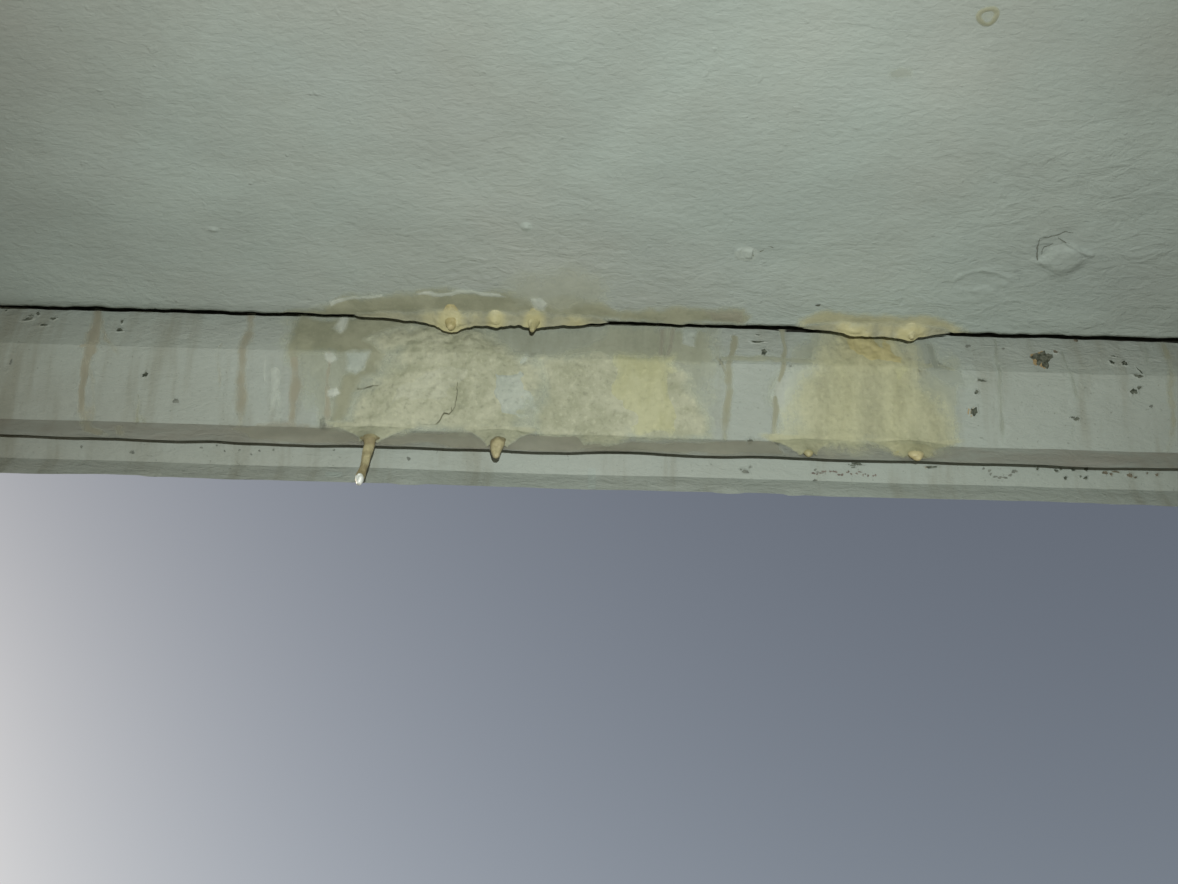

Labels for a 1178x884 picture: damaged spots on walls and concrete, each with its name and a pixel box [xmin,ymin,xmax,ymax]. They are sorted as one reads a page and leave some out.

crack [0,305,381,318]
crack [586,321,839,333]
crack [943,332,1178,343]
rust [237,313,255,412]
peeling [1030,349,1060,369]
rust [79,311,102,435]
water stain [287,289,963,457]